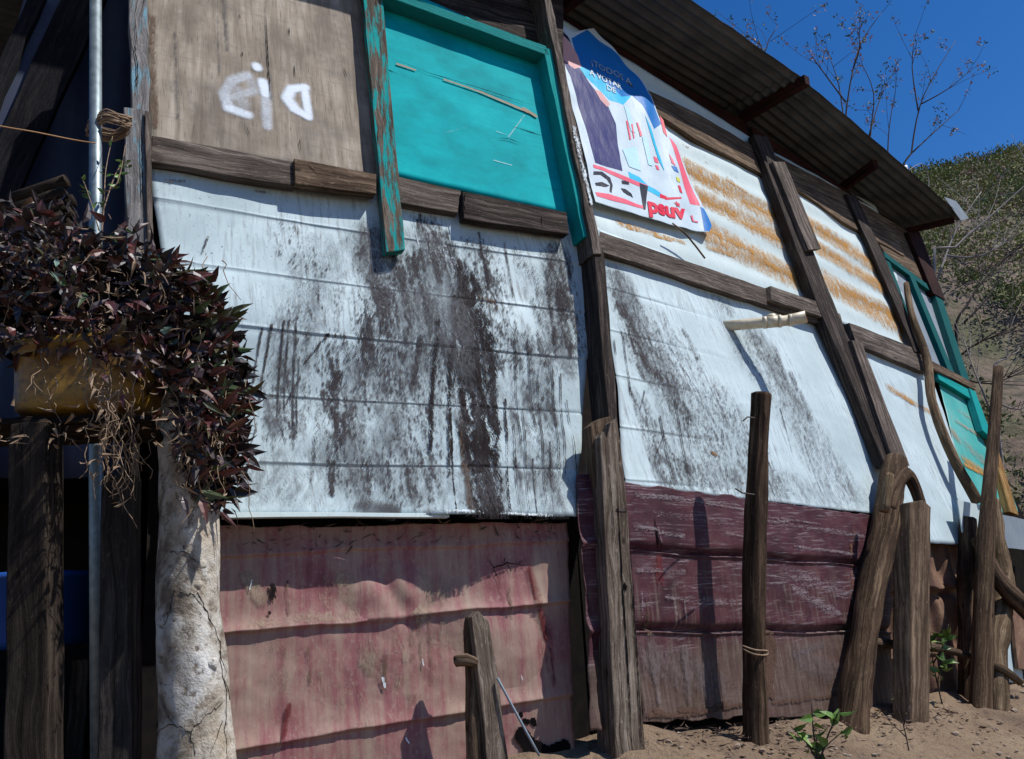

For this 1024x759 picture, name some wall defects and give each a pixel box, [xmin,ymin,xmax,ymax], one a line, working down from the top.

rust [681,146,803,291]
rust [806,213,906,343]
leakage [252,213,586,519]
leakage [605,264,750,490]
leakage [706,293,861,501]
peeling [635,493,744,537]
peeling [784,569,854,614]
peeling [640,642,725,703]